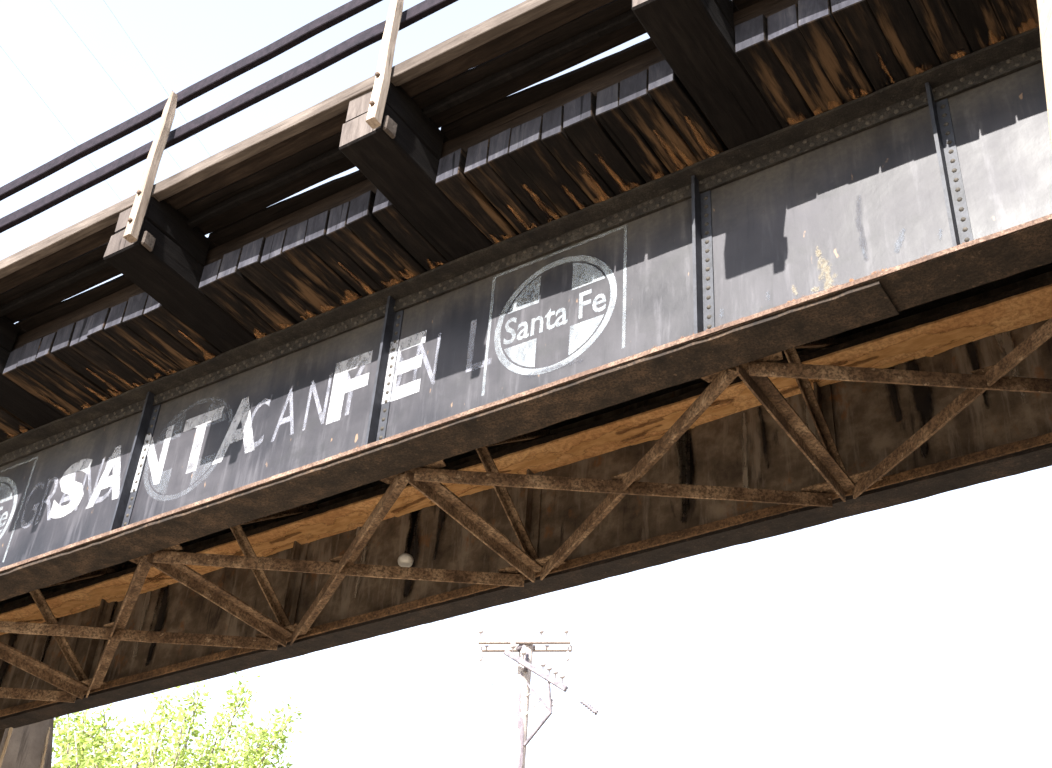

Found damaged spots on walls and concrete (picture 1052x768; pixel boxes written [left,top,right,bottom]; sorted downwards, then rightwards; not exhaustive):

corrosion [830,323,995,369]
corrosion [88,359,176,401]
corrosion [688,384,757,430]
corrosion [771,377,836,394]
corrosion [498,407,689,474]
damp [676,428,695,485]
damp [742,406,769,488]
corrosion [389,494,436,517]
corrosion [444,484,494,497]
corrosion [222,506,376,557]
corrosion [0,572,173,635]